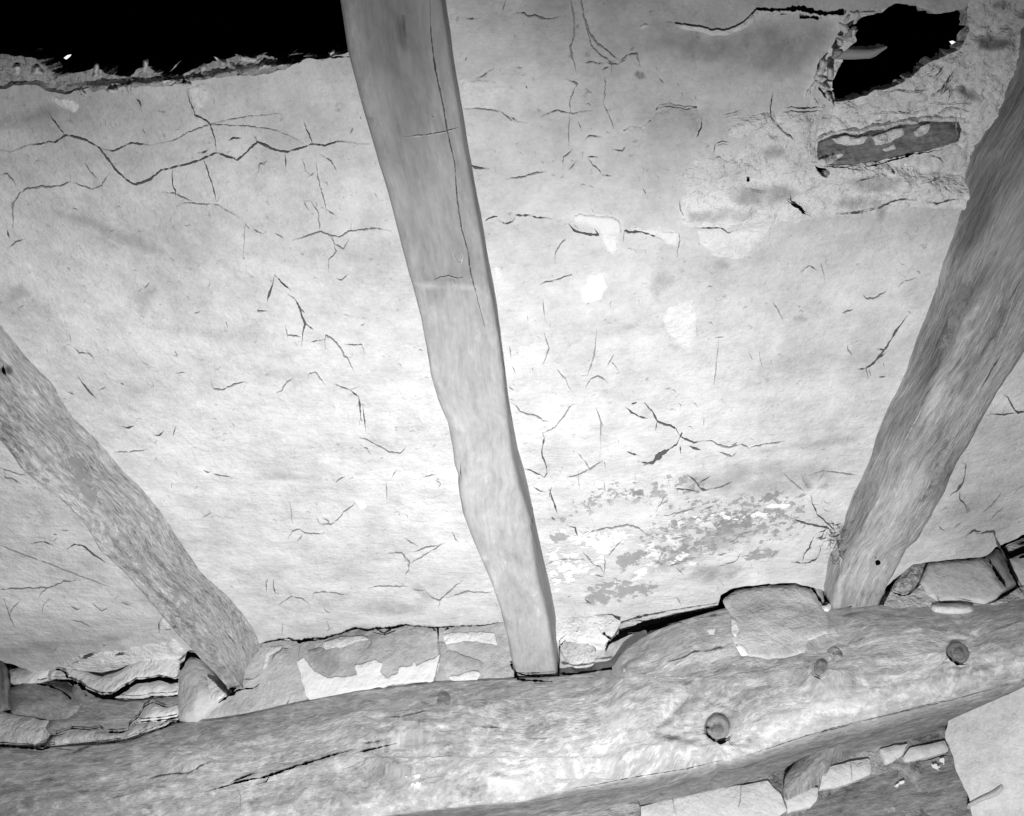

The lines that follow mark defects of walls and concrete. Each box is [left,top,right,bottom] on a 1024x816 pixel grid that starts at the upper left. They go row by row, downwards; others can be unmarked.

spalling [0,44,349,97]
crack [4,89,392,281]
crack [466,0,844,188]
spalling [805,0,1024,210]
crack [257,275,404,498]
crack [486,202,786,585]
peeling [546,503,791,592]
peeling [297,654,440,700]
peeling [449,671,480,681]